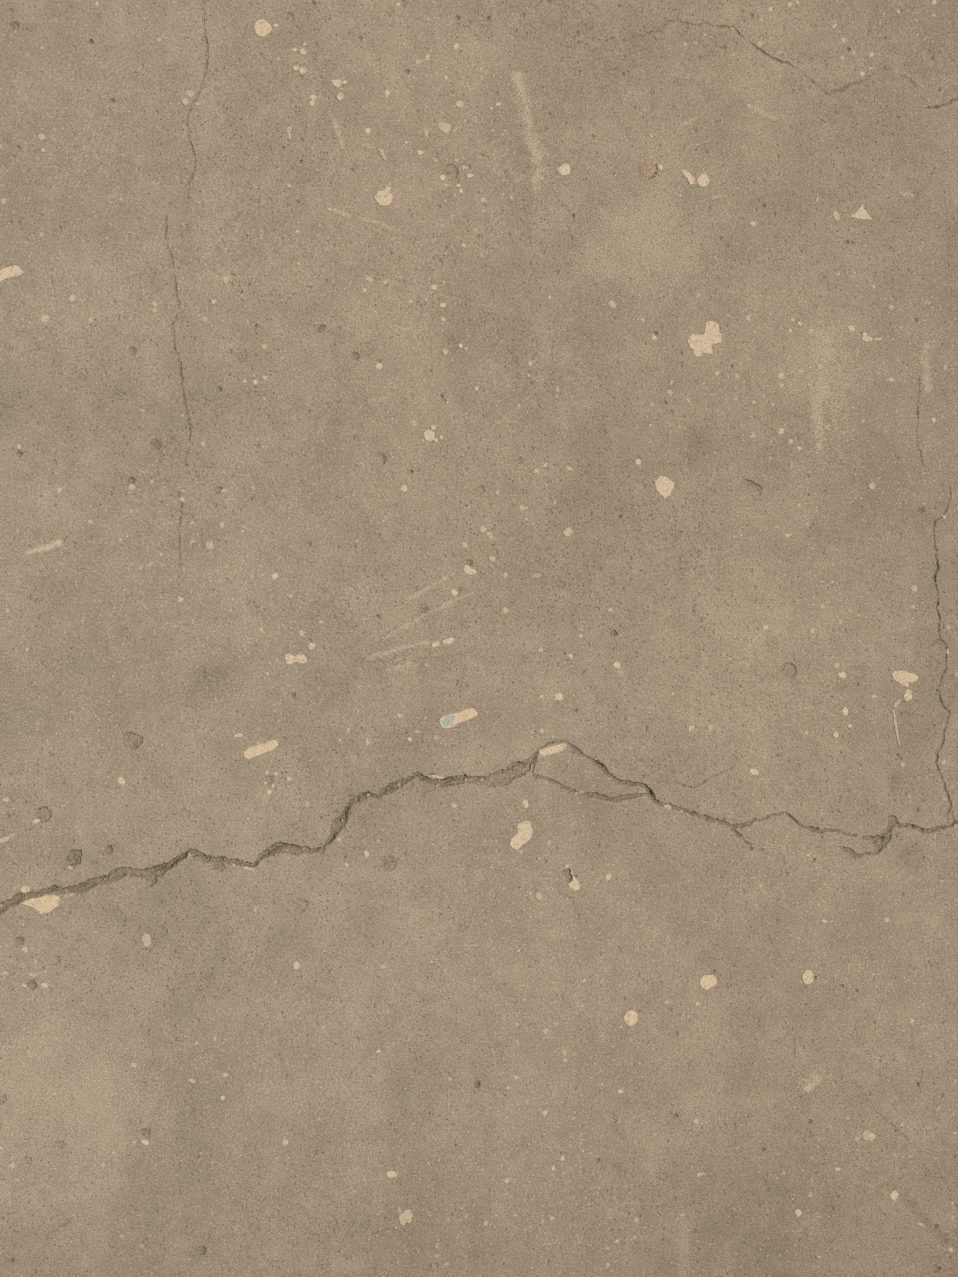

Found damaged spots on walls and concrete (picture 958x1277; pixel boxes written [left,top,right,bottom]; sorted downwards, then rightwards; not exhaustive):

crack [578,18,958,109]
crack [165,0,209,586]
crack [915,355,925,466]
crack [0,486,958,916]